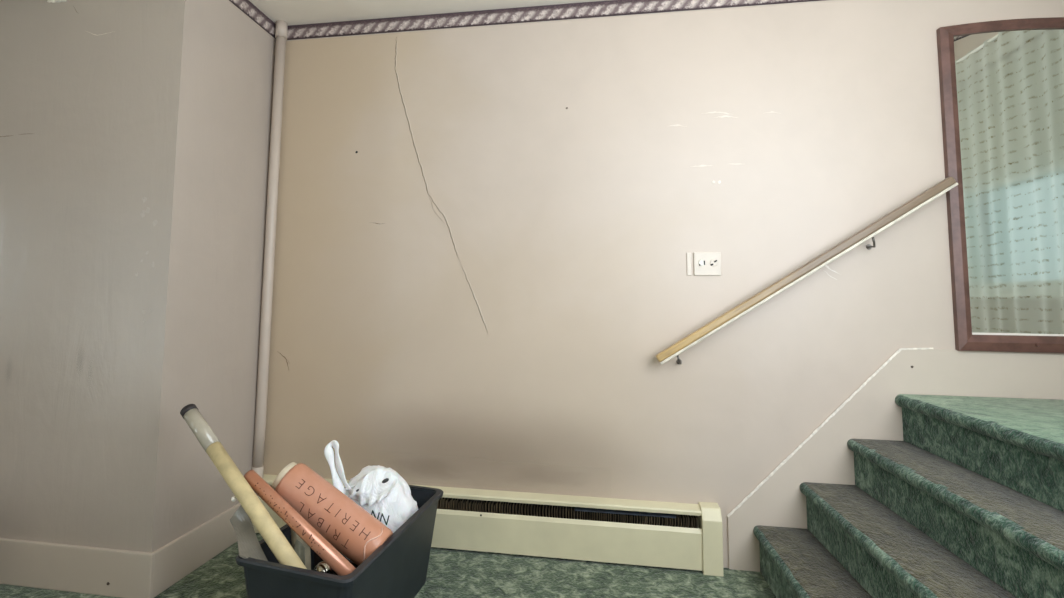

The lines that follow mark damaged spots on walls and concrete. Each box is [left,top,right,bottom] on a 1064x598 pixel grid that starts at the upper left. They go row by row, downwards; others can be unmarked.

crack [395,37,487,330]